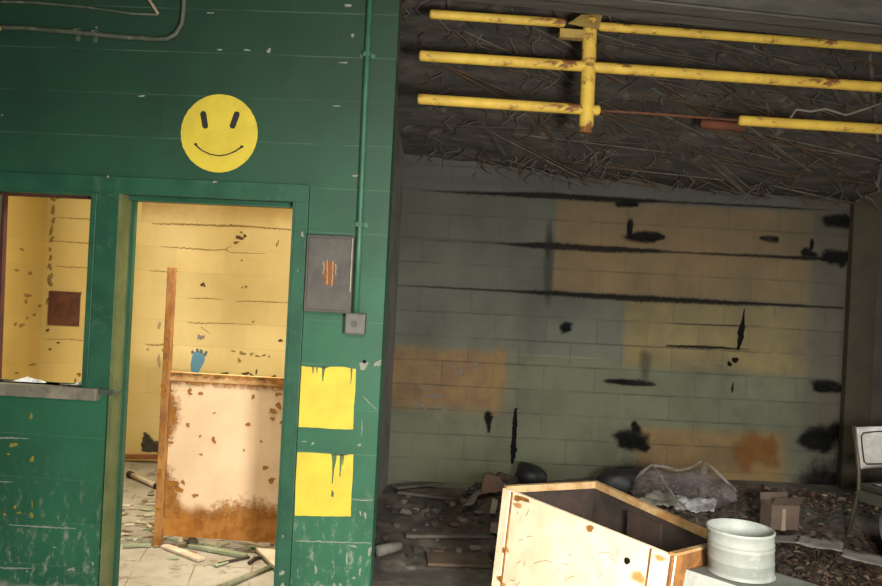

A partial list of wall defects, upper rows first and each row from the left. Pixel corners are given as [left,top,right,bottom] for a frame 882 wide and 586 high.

peeling [47,198,64,287]
corrosion [323,261,335,285]
crack [441,287,843,350]
crack [510,408,519,464]
leakage [619,421,650,452]
leakage [798,425,839,449]
corrosion [153,468,277,548]